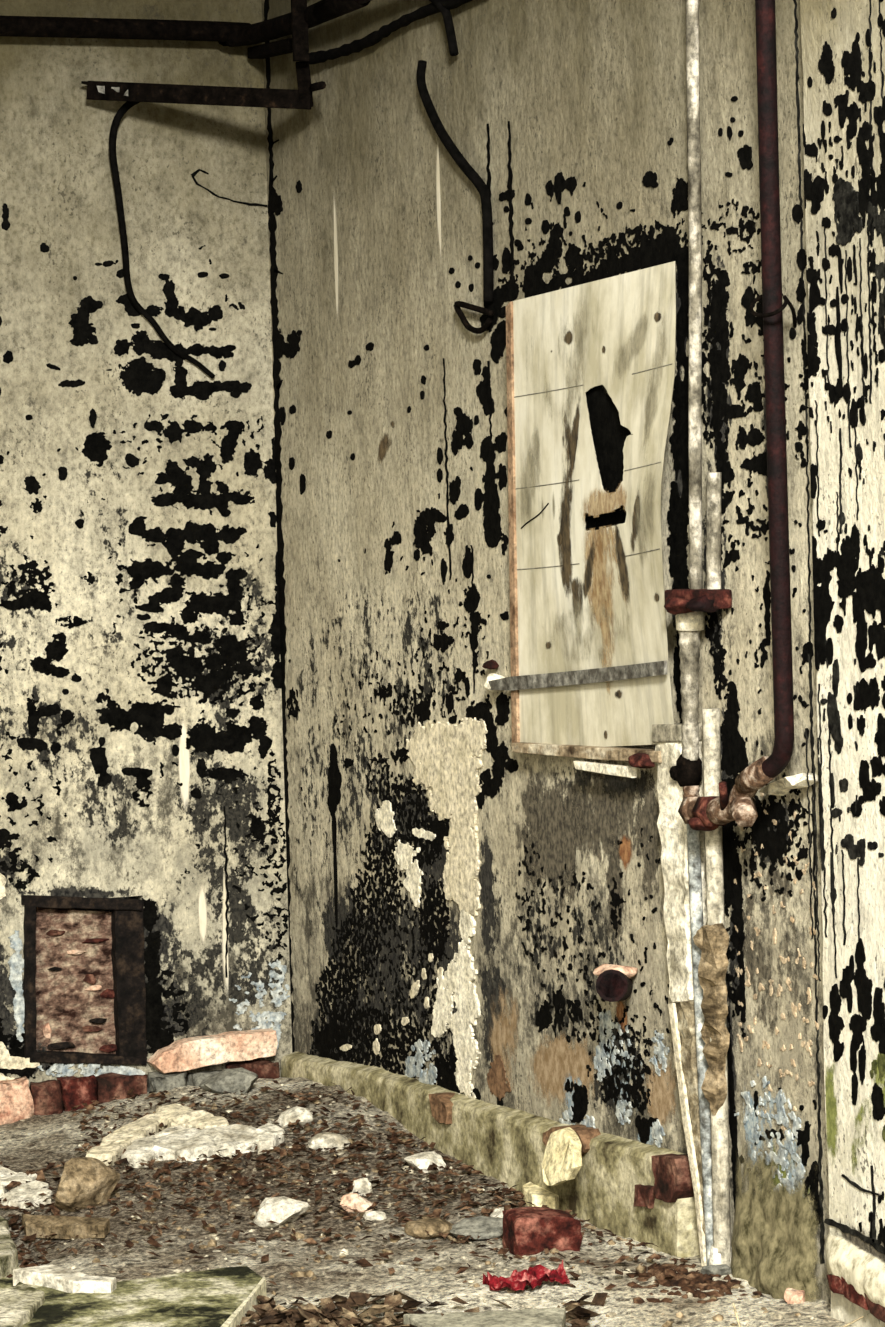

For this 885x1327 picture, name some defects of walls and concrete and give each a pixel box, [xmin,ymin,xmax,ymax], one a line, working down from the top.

peeling [1,203,11,231]
peeling [3,350,13,364]
peeling [718,96,753,177]
peeling [0,555,88,891]
peeling [24,245,306,1054]
leakage [290,586,463,1078]
peeling [307,171,771,1106]
peeling [515,834,707,1266]
peeling [722,512,885,1225]
peeling [859,1191,885,1248]